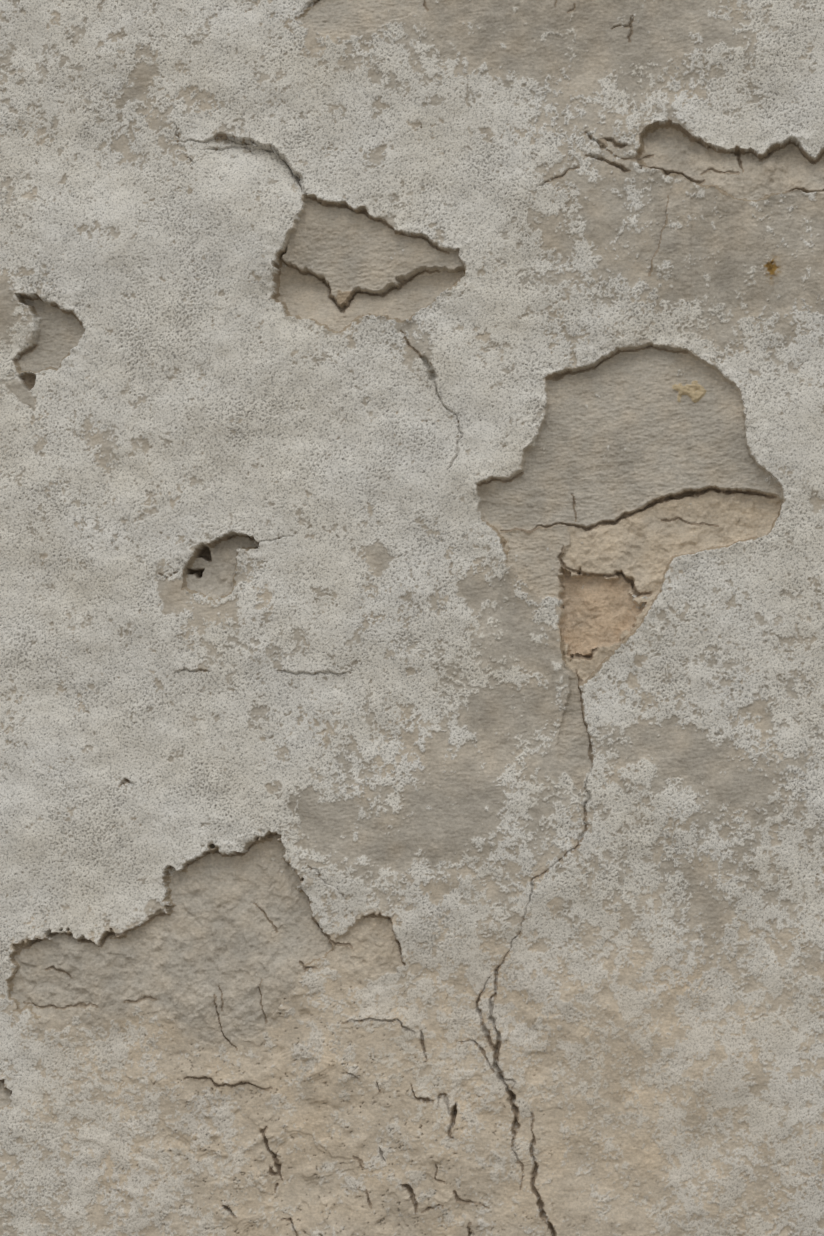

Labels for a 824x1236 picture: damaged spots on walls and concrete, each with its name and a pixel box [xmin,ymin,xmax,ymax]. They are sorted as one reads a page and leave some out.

spalling [271,194,467,334]
peeling [635,118,824,316]
spalling [0,273,85,413]
crack [400,330,464,470]
spalling [158,532,297,602]
spalling [456,342,786,687]
crack [276,669,356,677]
spalling [7,673,558,1049]
crack [456,660,594,1236]
crack [179,979,275,1091]
crack [260,1126,308,1236]
crack [341,1011,490,1216]